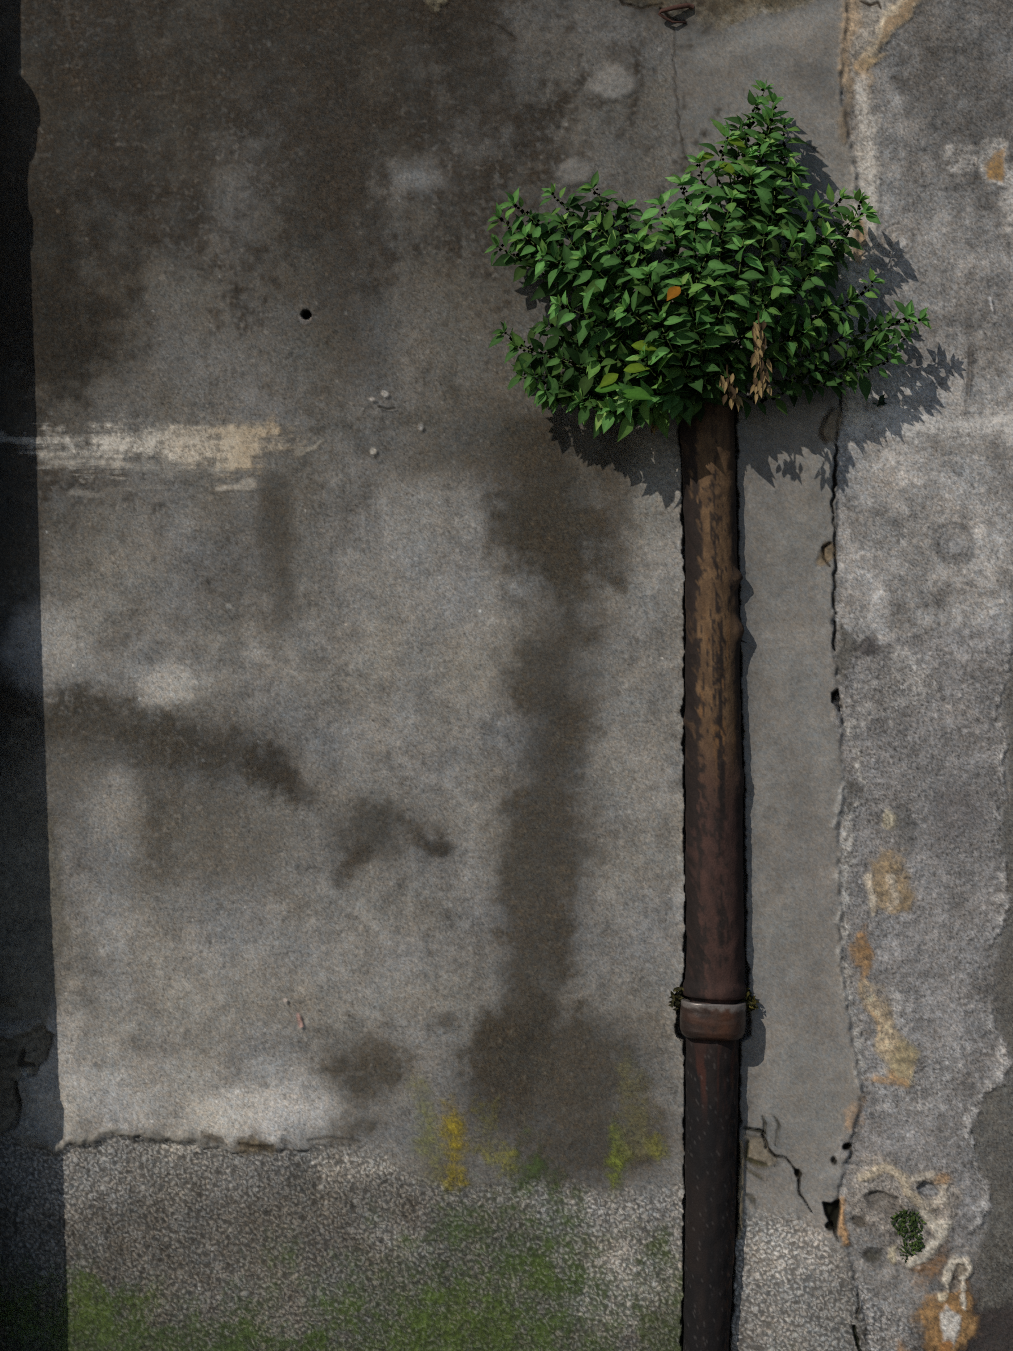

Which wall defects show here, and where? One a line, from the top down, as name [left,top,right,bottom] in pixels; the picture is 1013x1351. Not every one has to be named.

crack [620,0,687,129]
peeling [0,422,321,491]
crack [831,377,842,650]
crack [832,690,844,724]
peeling [817,0,1013,1324]
water stain [0,684,301,1022]
water stain [461,419,667,1189]
flaking render [0,1027,274,1153]
crack [744,1117,812,1212]
crack [853,1291,861,1351]
rust [912,1256,977,1351]